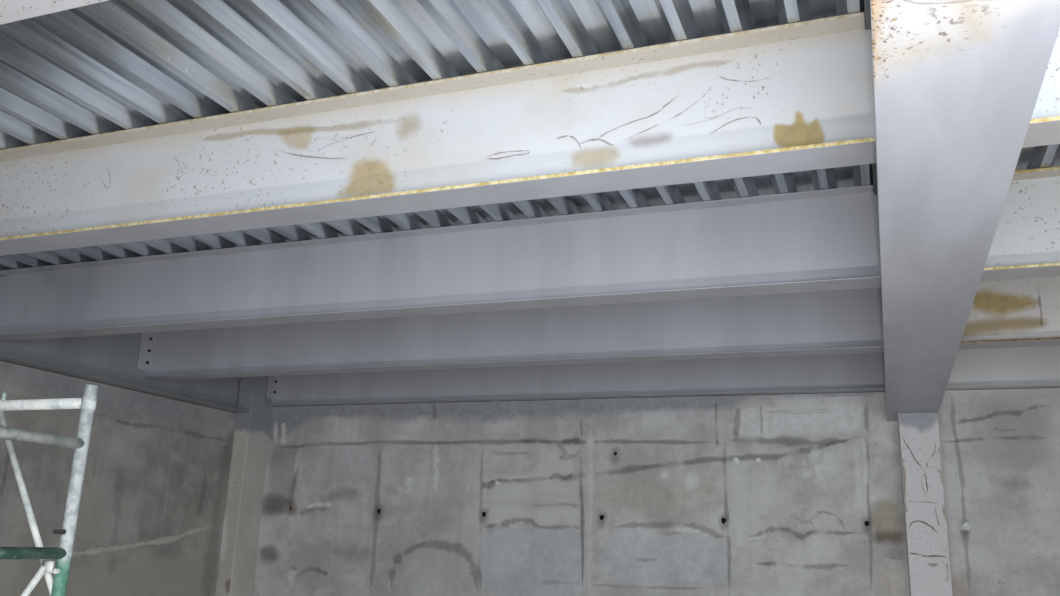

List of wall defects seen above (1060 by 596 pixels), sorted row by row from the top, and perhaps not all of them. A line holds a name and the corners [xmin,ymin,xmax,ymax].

corrosion [870,0,911,93]
corrosion [928,0,1015,52]
crack [672,525,702,535]